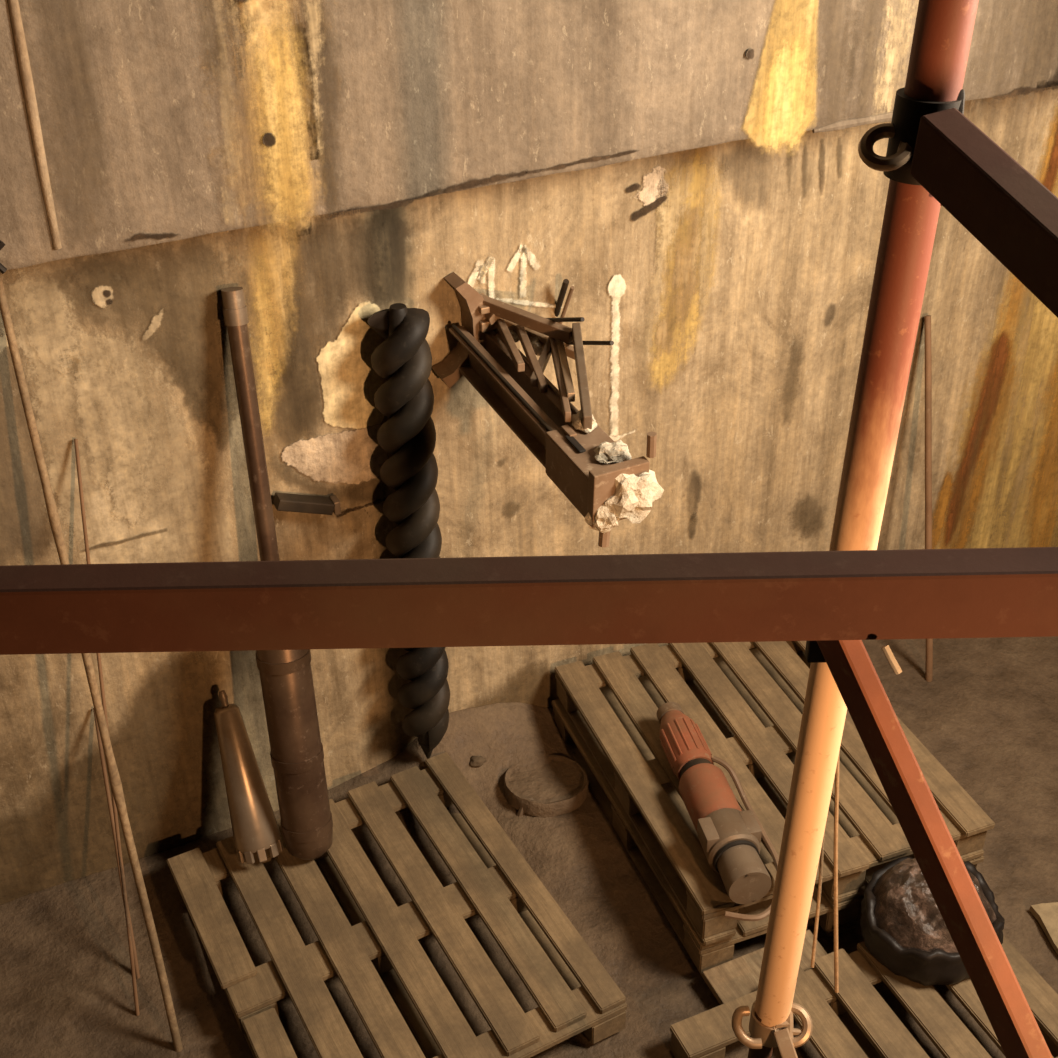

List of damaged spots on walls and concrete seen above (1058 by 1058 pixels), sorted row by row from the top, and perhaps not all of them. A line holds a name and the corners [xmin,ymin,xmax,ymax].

corrosion [230,0,325,319]
spalling [626,166,669,221]
corrosion [743,0,818,149]
corrosion [1041,115,1058,197]
water stain [44,213,406,473]
peeling [275,301,389,501]
corrosion [932,275,1058,549]